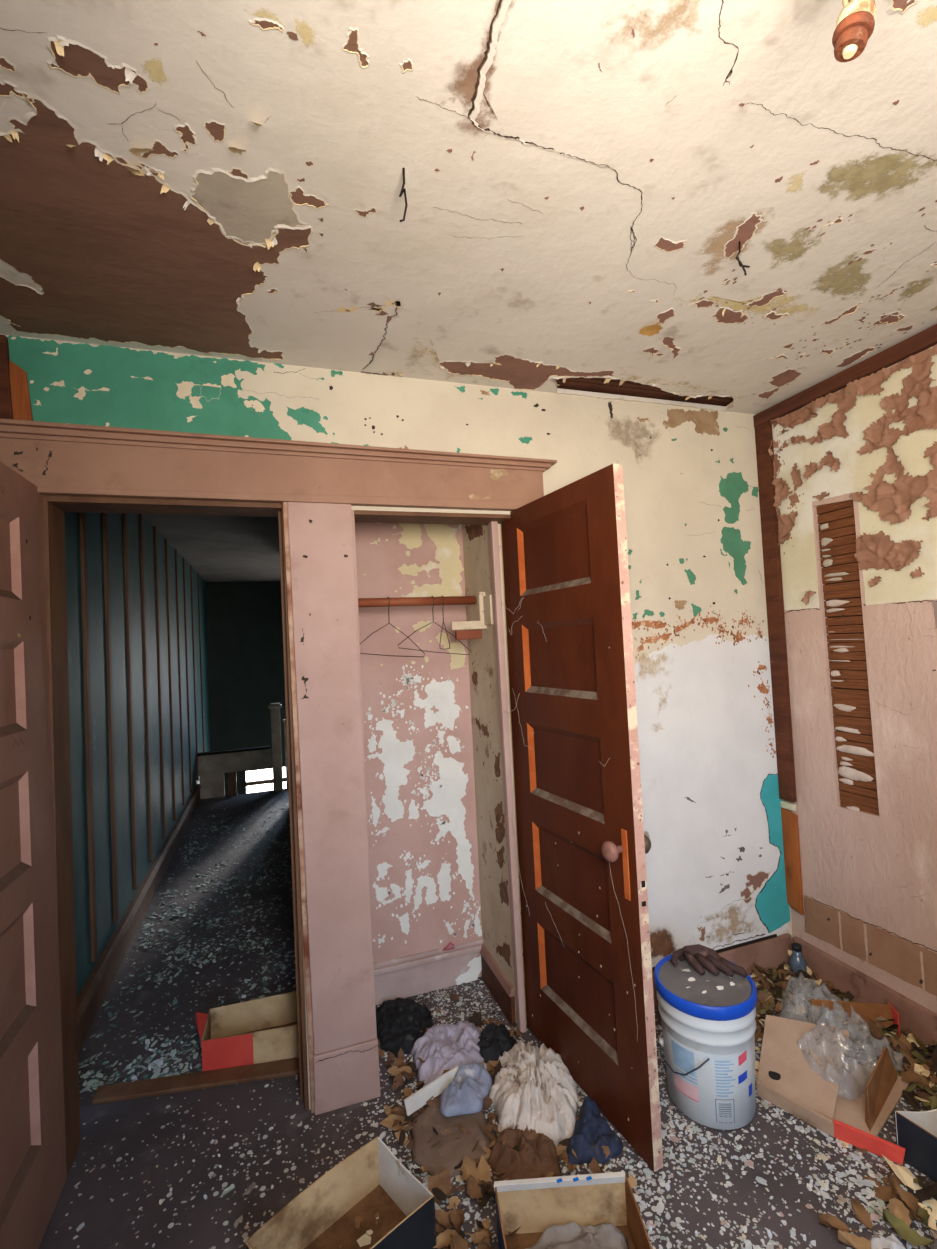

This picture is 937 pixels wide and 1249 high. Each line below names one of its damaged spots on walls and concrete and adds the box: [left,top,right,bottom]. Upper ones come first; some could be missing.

peeling [46,35,151,97]
peeling [248,18,299,41]
crack [416,0,677,292]
crack [718,0,936,161]
peeling [0,56,339,444]
peeling [436,354,736,439]
peeling [711,344,937,594]
peeling [753,287,923,400]
peeling [370,523,483,597]
peeling [632,579,763,652]
peeling [365,619,523,1040]
spalling [705,773,791,934]